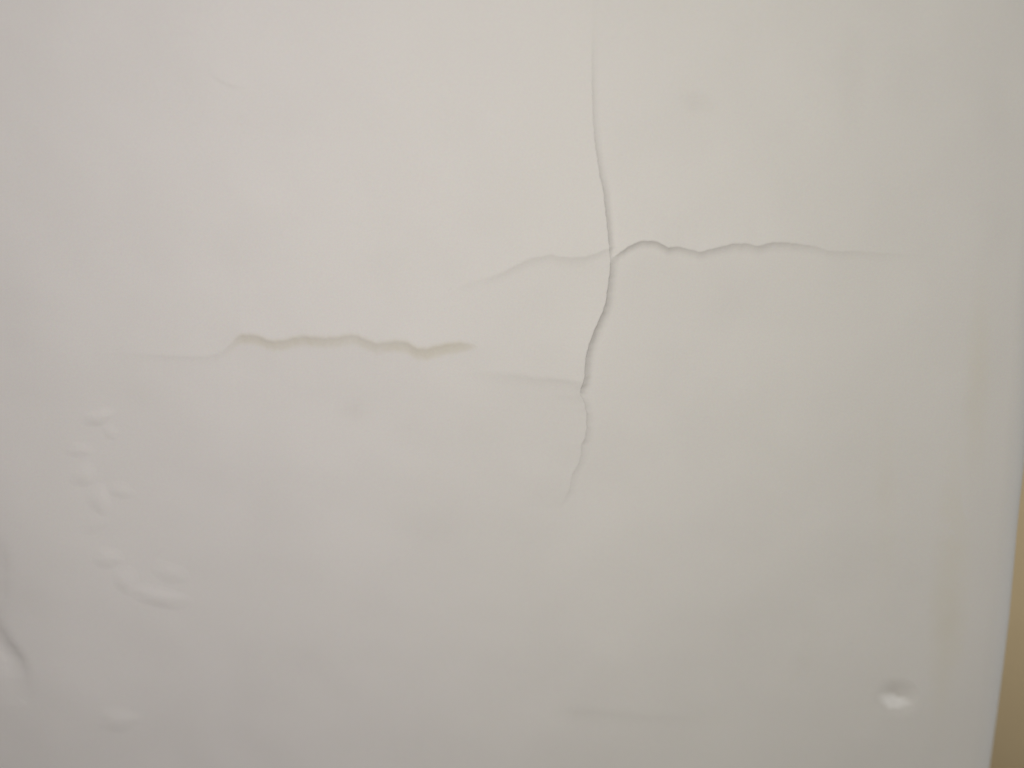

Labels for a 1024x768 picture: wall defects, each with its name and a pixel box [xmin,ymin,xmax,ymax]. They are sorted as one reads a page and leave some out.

crack [114,0,924,506]